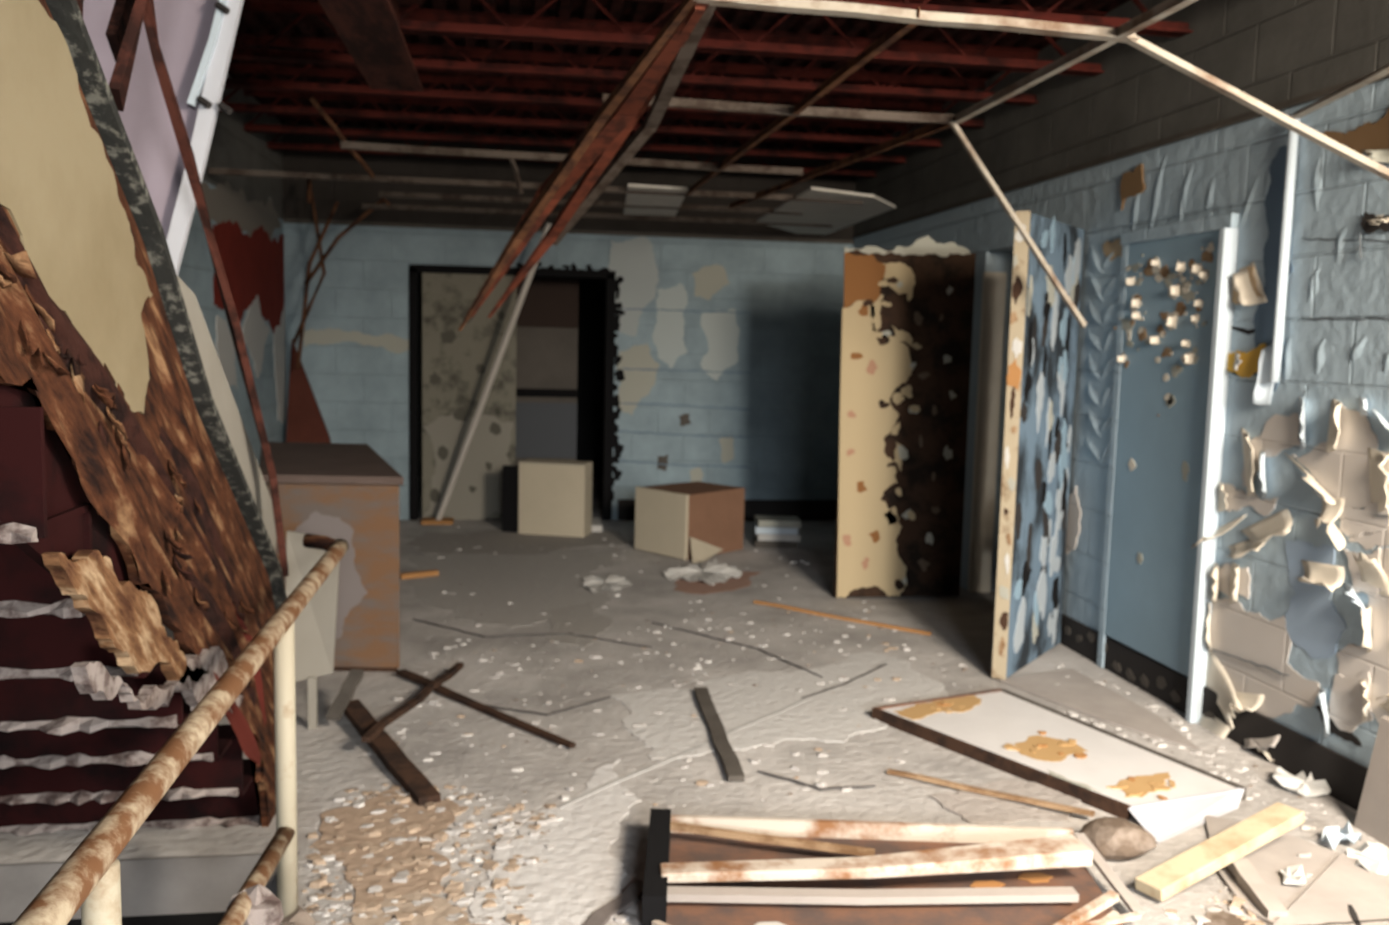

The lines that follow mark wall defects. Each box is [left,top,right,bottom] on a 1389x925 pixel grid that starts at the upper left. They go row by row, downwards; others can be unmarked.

peeling [201,180,287,424]
peeling [863,277,957,520]
peeling [999,216,1082,657]
peeling [1102,237,1214,408]
peeling [0,522,38,544]
peeling [0,667,74,681]
peeling [0,598,86,618]
peeling [104,666,138,676]
corrosion [163,459,245,631]
peeling [895,577,907,590]
peeling [918,532,933,572]
peeling [1203,404,1389,733]